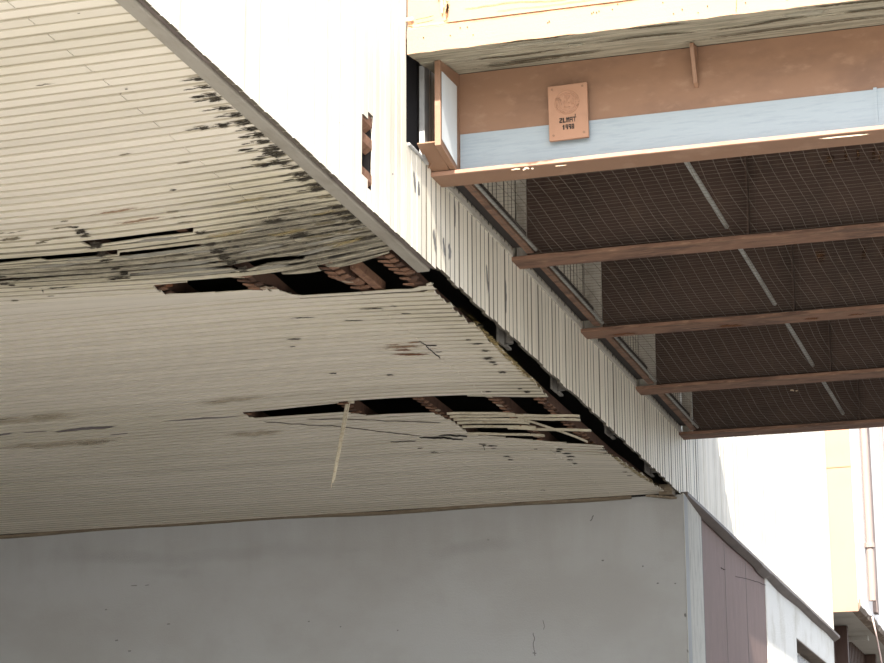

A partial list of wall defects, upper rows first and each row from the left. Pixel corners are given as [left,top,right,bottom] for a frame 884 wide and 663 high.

damp [470,0,884,70]
damp [184,76,378,246]
peeling [125,237,241,287]